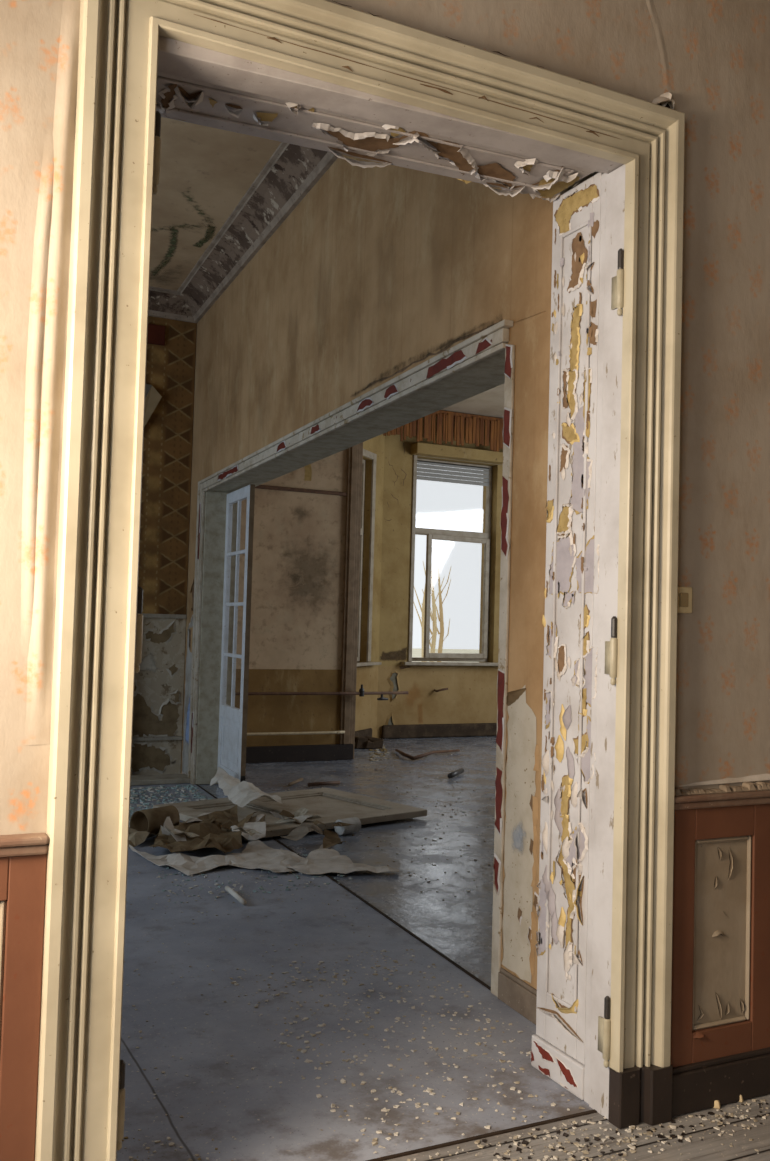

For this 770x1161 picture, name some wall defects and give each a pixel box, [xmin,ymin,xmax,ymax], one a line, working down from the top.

flaking render [131,576,195,775]
flaking render [158,84,600,983]